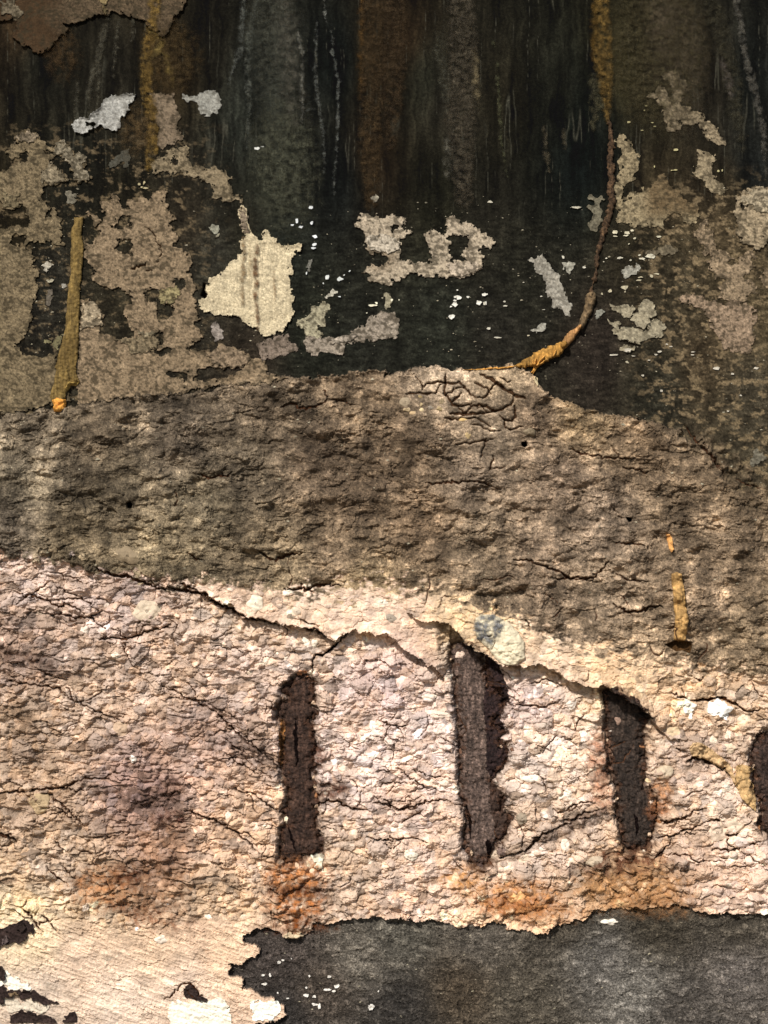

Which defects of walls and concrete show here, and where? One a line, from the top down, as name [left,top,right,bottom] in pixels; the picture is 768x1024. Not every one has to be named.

peeling [0,93,136,415]
peeling [66,90,496,404]
peeling [586,71,768,361]
crack [16,568,346,673]
corrosion [266,673,348,932]
spalling [0,546,768,947]
crack [510,678,560,708]
crack [615,605,660,613]
crack [671,692,760,712]
peeling [250,992,289,1021]